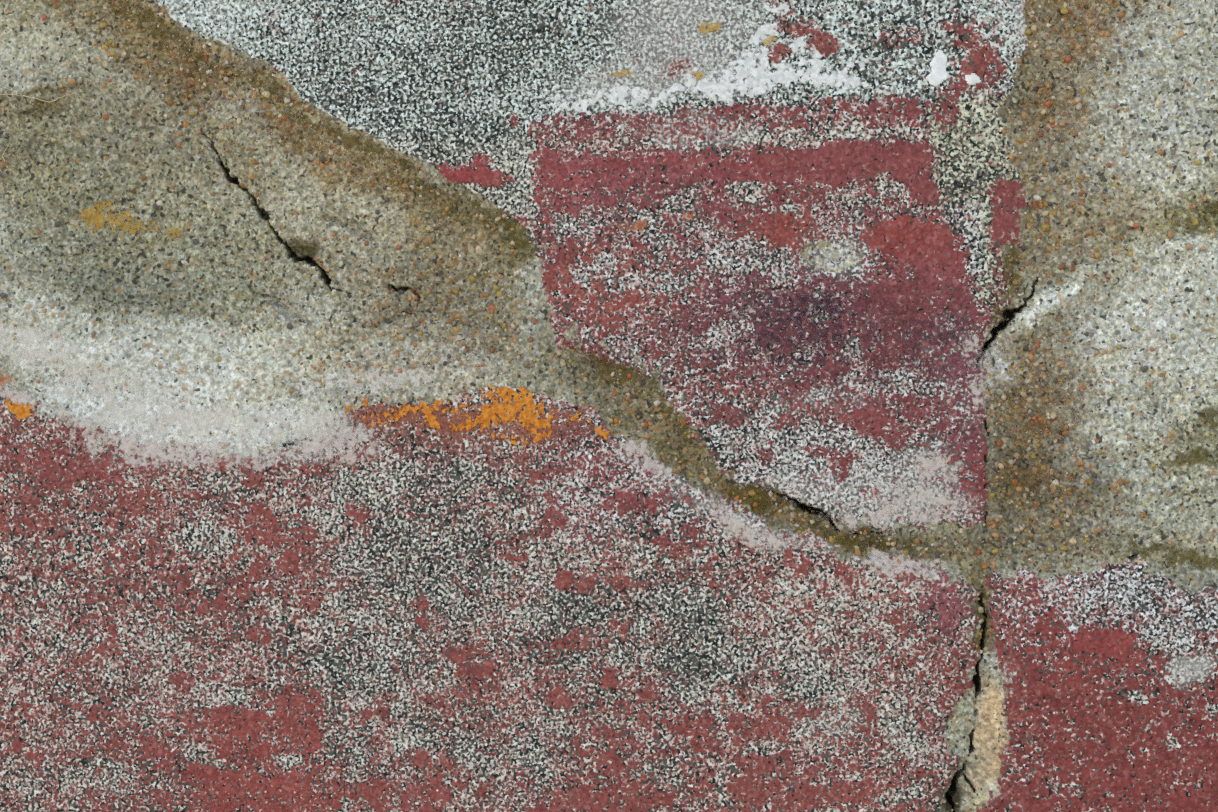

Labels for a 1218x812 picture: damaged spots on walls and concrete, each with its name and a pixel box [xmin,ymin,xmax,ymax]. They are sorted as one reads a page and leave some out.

crack [203,135,421,350]
crack [977,278,1039,364]
crack [772,491,883,535]
crack [983,421,991,525]
crack [945,586,988,812]